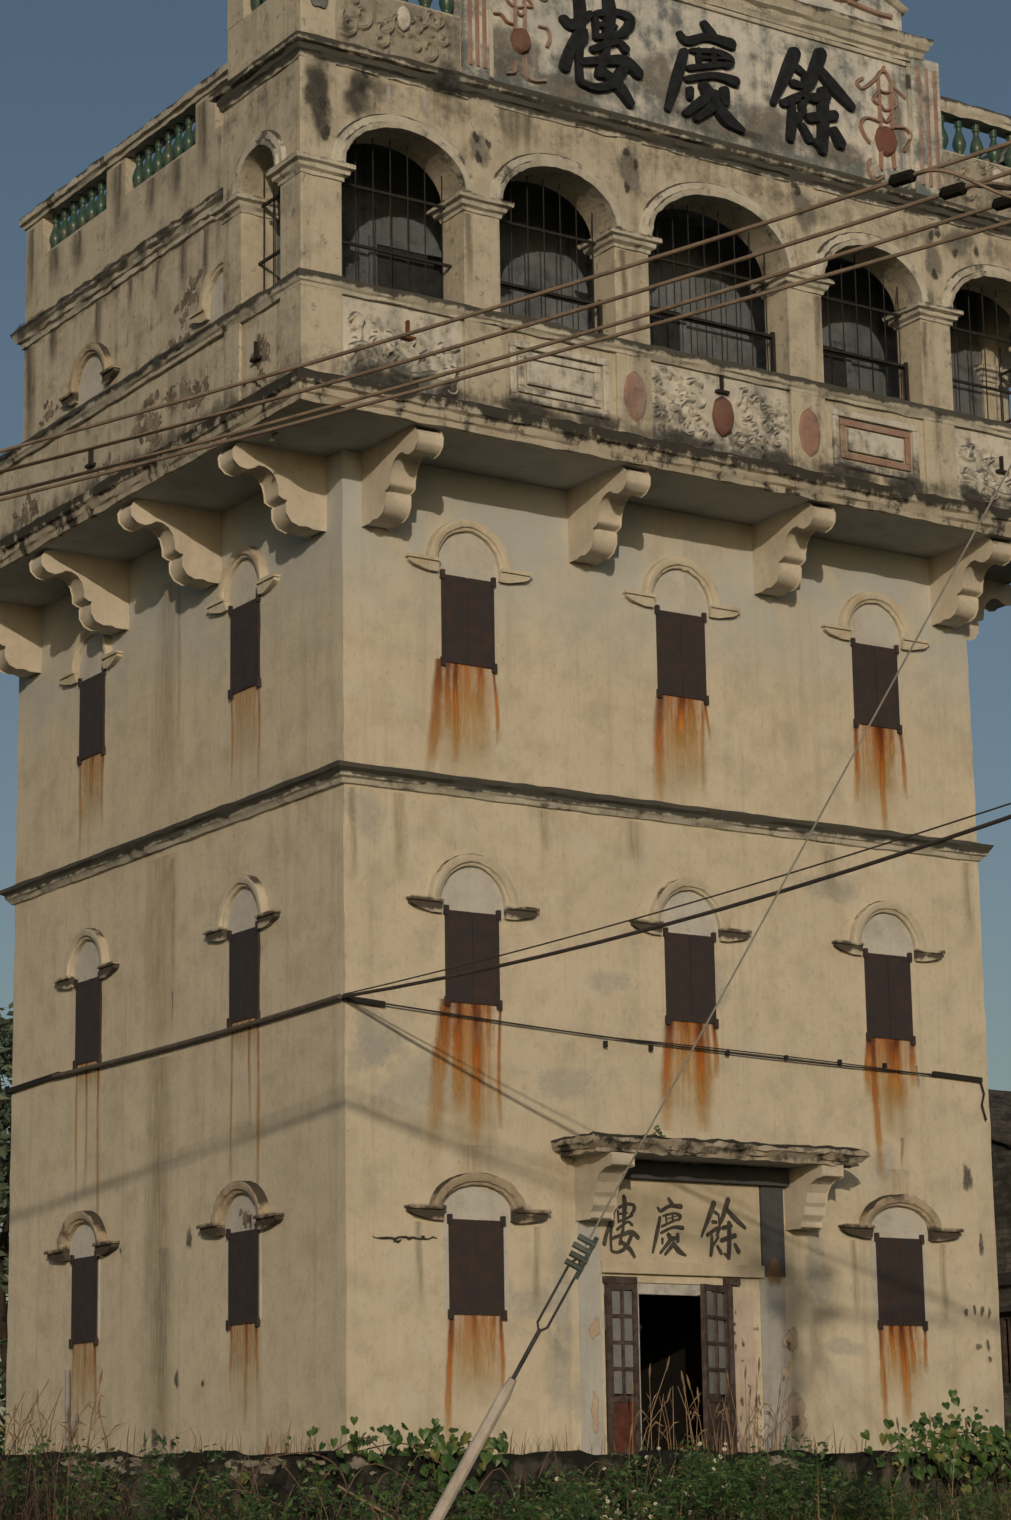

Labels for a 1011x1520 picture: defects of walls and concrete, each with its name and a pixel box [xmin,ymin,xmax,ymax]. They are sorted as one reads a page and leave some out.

corrosion [79,752,104,825]
corrosion [431,659,499,745]
corrosion [655,694,710,781]
corrosion [854,724,906,817]
corrosion [433,999,501,1122]
corrosion [663,1020,718,1105]
corrosion [865,1037,915,1146]
crack [372,1235,437,1243]
corrosion [446,1315,505,1420]
corrosion [879,1325,927,1404]